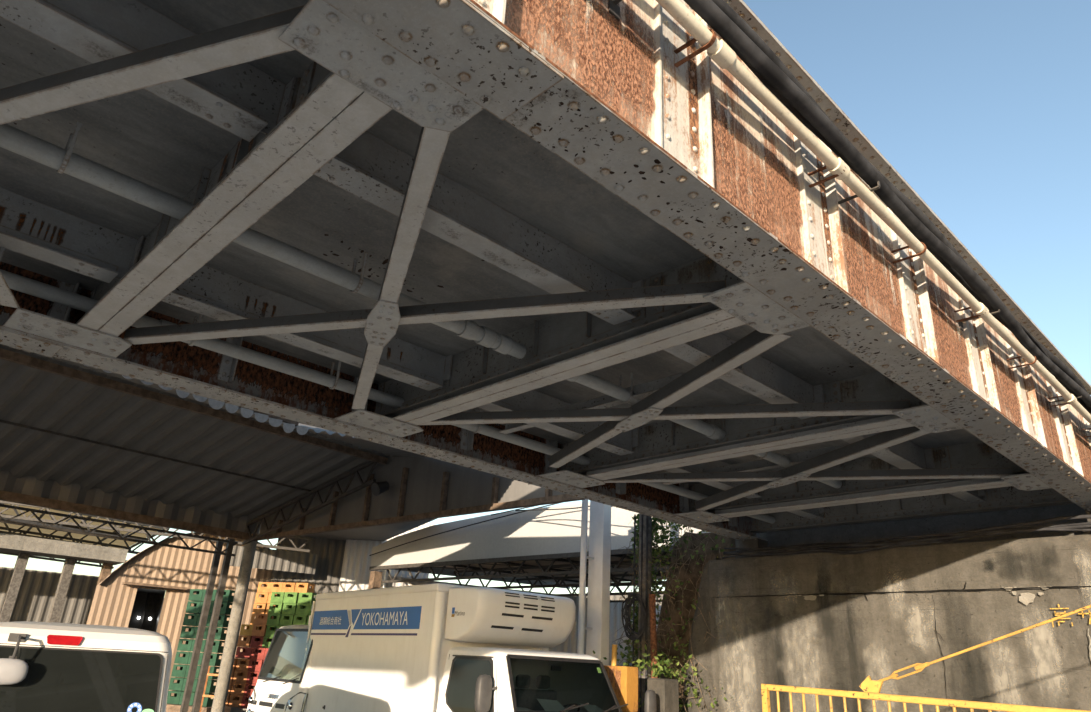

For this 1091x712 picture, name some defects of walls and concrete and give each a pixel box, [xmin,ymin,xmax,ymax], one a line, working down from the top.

corrosion [470,0,1091,483]
corrosion [0,289,54,315]
corrosion [118,326,219,374]
corrosion [234,340,355,413]
corrosion [417,424,560,472]
corrosion [601,483,680,508]
water stain [886,577,933,647]
water stain [1079,555,1091,612]
water stain [717,590,756,712]
water stain [873,650,893,712]
water stain [978,646,1020,712]
water stain [1026,617,1063,694]